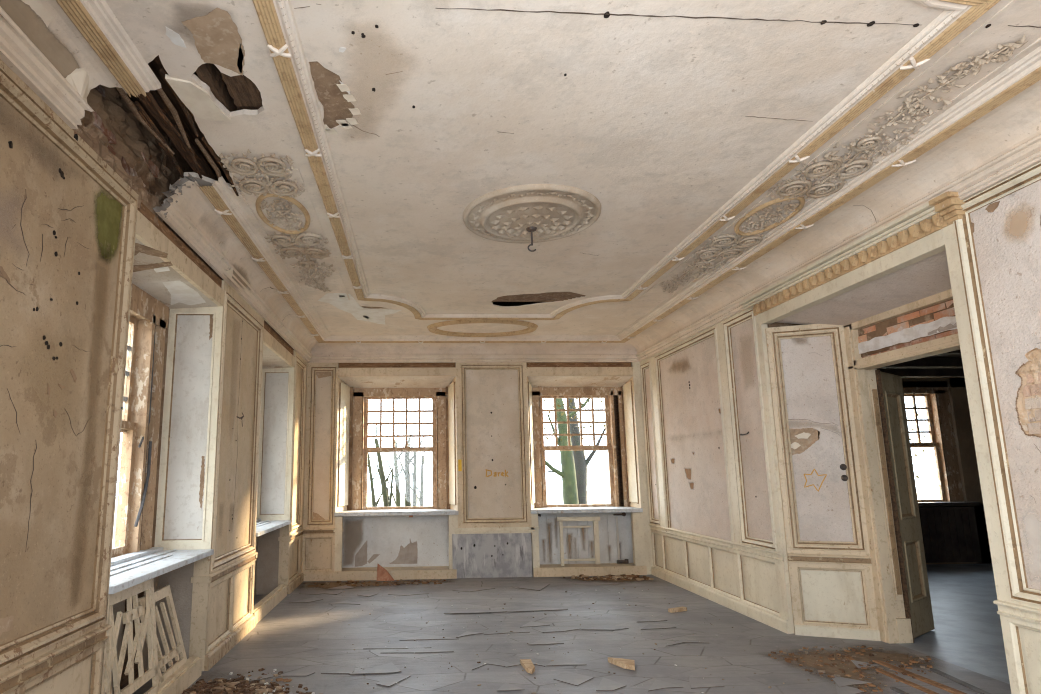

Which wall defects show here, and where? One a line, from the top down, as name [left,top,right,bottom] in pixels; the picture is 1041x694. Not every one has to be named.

peeling [166,8,245,75]
flaking render [309,61,361,135]
spalling [65,68,161,226]
flaking render [491,292,586,302]
spalling [1015,348,1041,438]